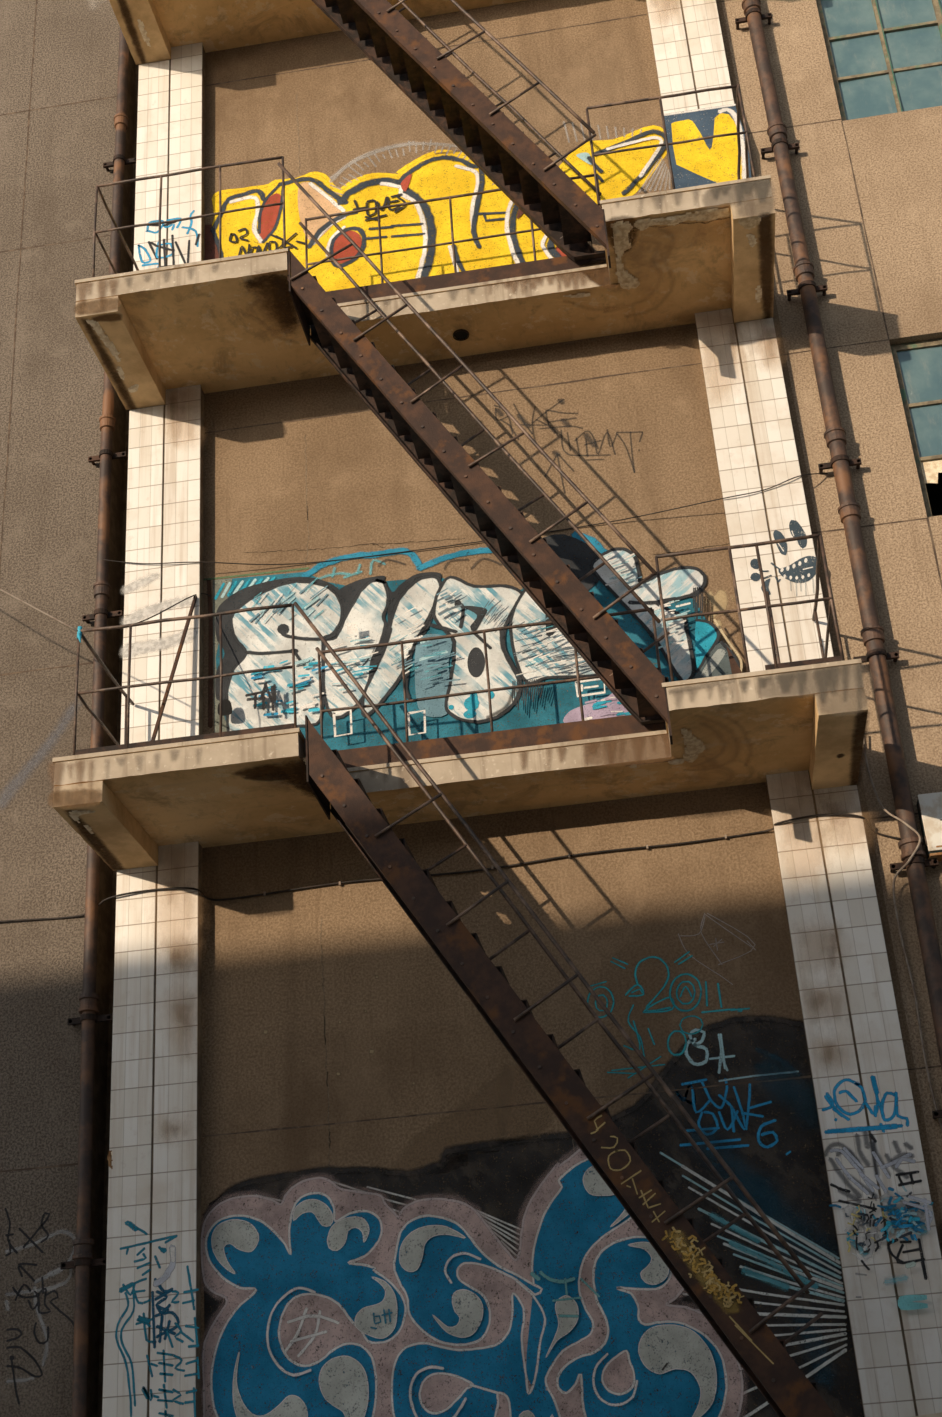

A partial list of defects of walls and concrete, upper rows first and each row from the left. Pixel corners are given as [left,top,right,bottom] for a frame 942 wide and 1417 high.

peeling [606,208,773,319]